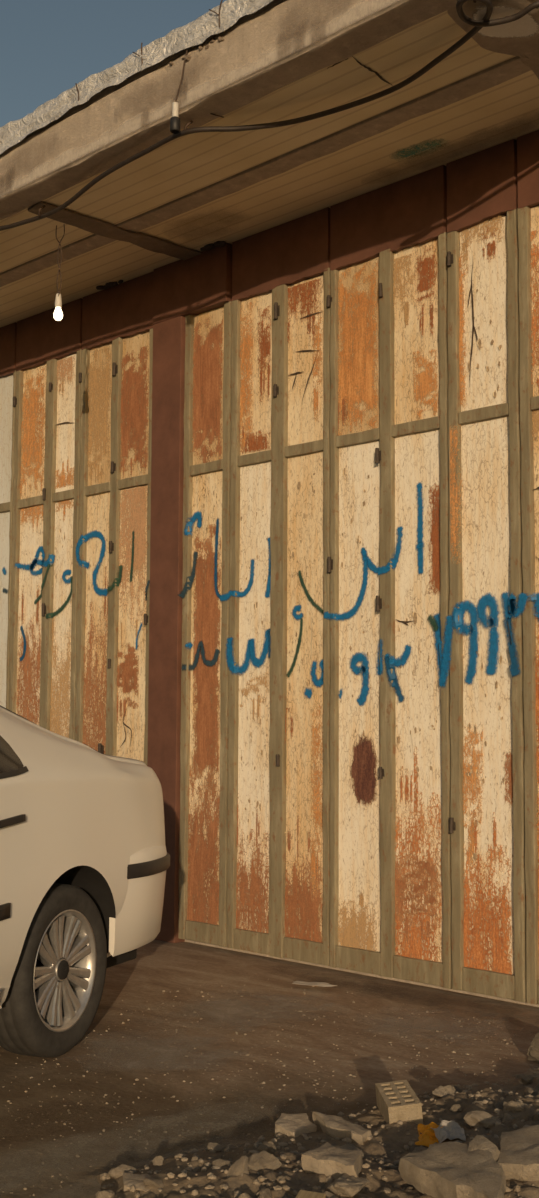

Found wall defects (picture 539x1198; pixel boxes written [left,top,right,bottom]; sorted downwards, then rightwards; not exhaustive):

crack [327,56,392,85]
corrosion [192,311,223,463]
corrosion [239,302,271,453]
corrosion [338,261,378,435]
corrosion [393,241,438,419]
corrosion [16,346,149,754]
corrosion [187,524,221,925]
corrosion [236,805,269,933]
corrosion [285,706,323,943]
corrosion [350,736,377,806]
corrosion [395,747,442,962]
corrosion [462,725,513,975]